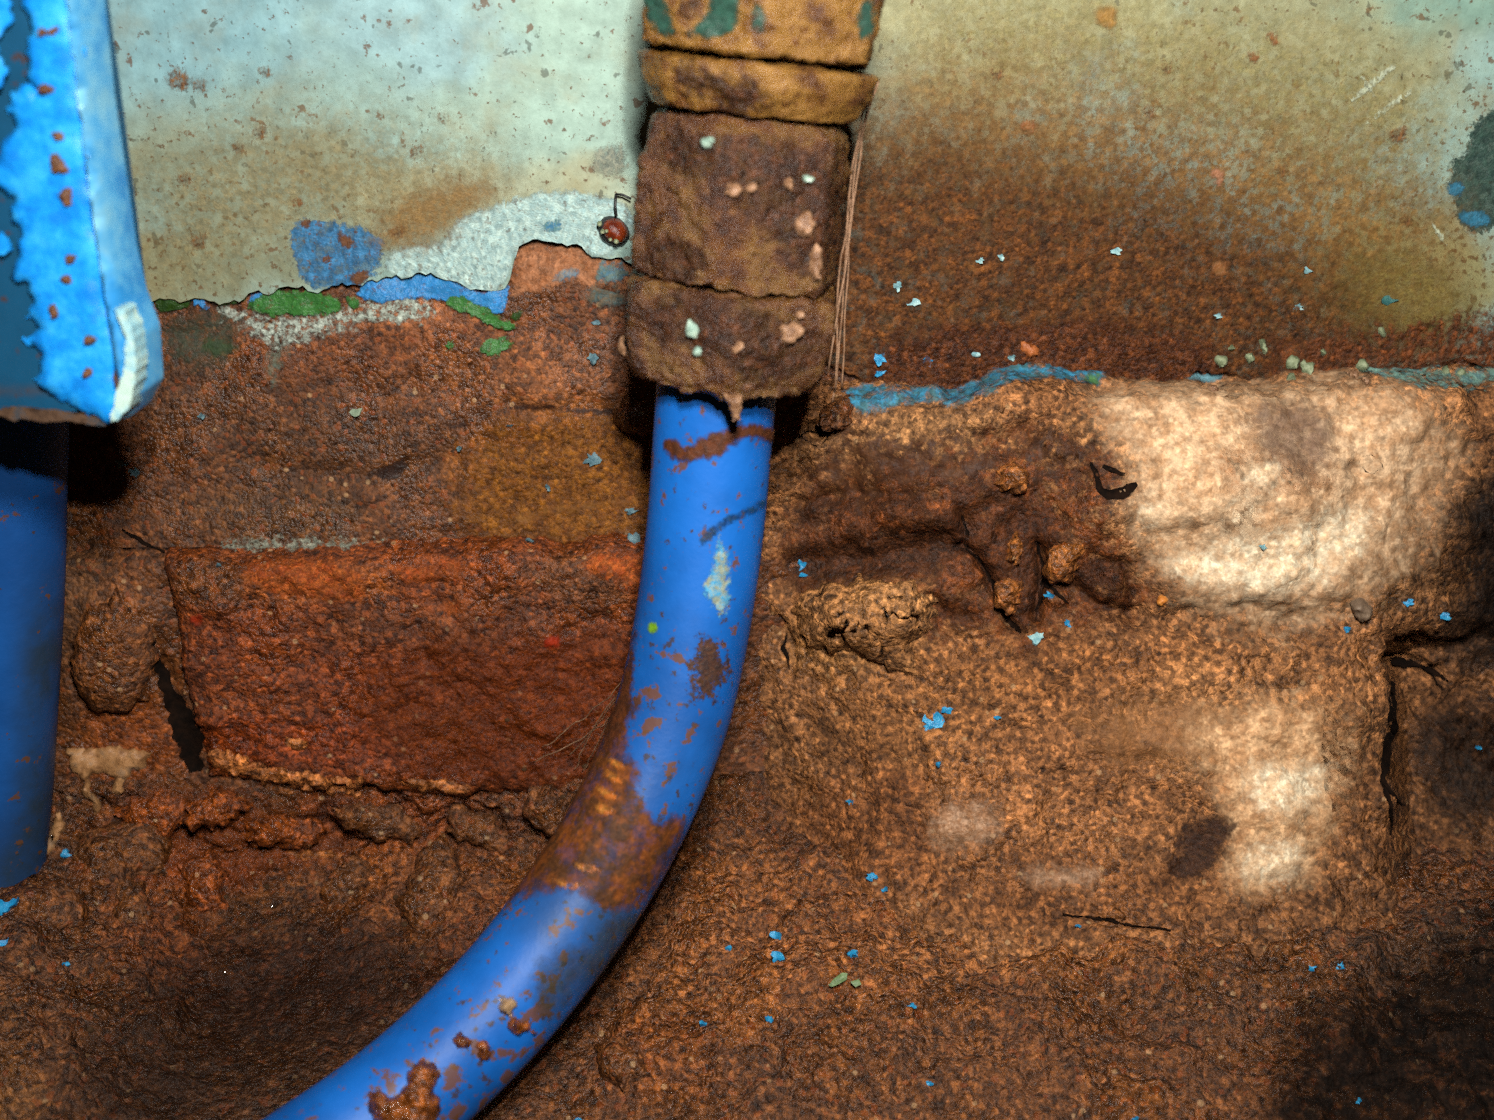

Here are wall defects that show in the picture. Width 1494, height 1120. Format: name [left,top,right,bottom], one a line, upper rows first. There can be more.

peeling [0,0,148,425]
crack [1380,656,1449,835]
leakage [1154,815,1237,886]